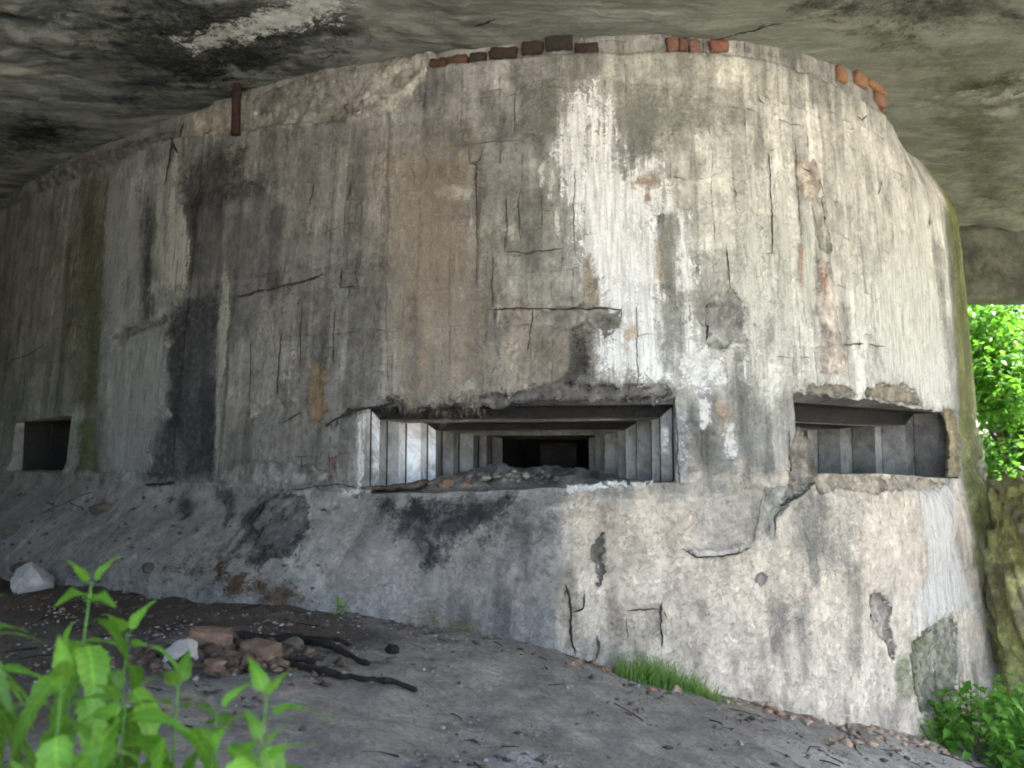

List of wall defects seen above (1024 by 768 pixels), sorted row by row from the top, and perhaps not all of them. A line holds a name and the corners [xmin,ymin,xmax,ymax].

leakage [82,169,202,481]
leakage [200,270,231,478]
crack [448,91,653,386]
leakage [523,76,819,478]
spalling [697,288,751,352]
crack [768,142,828,252]
flaking render [794,158,833,255]
spalling [799,382,923,407]
crack [683,429,816,558]
spalling [591,532,606,587]
crack [564,584,600,661]
spalling [869,592,897,660]